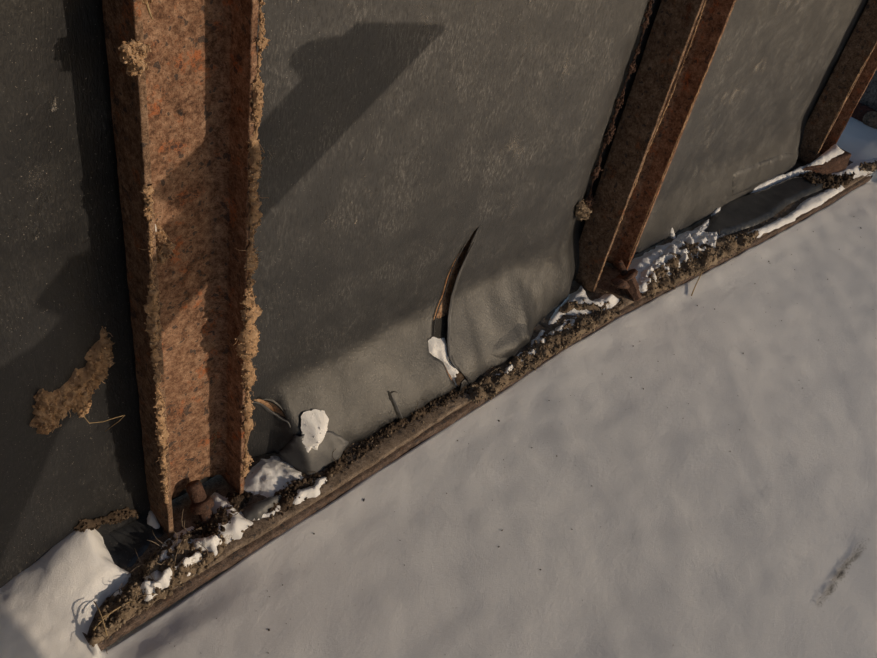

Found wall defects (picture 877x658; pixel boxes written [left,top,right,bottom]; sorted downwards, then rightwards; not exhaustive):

corrosion [584,0,654,210]